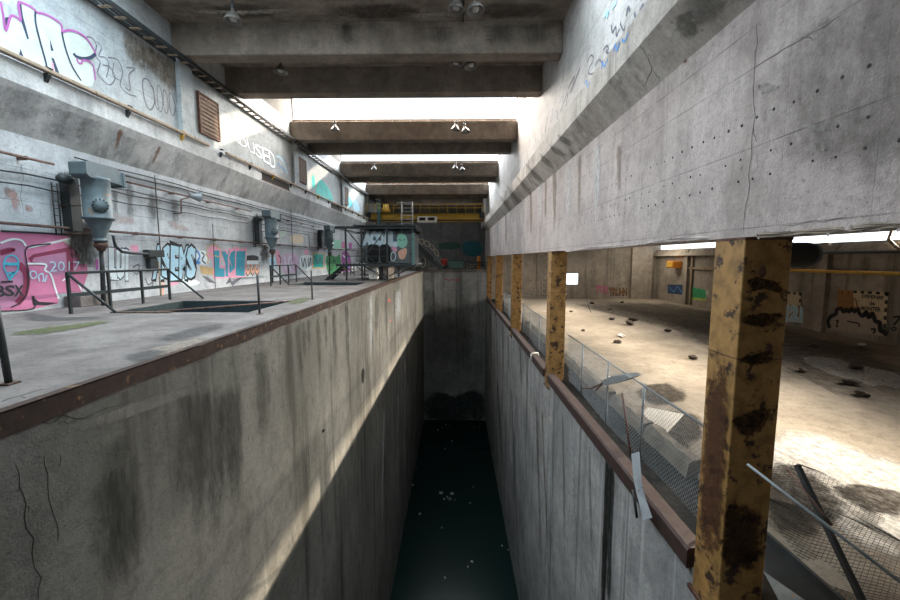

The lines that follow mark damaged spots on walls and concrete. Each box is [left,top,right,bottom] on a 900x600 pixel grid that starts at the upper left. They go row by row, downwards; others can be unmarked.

crack [743,18,836,228]
corrosion [740,351,774,365]
corrosion [743,313,782,327]
corrosion [748,277,783,293]
crack [16,454,96,600]
corrosion [700,354,769,570]